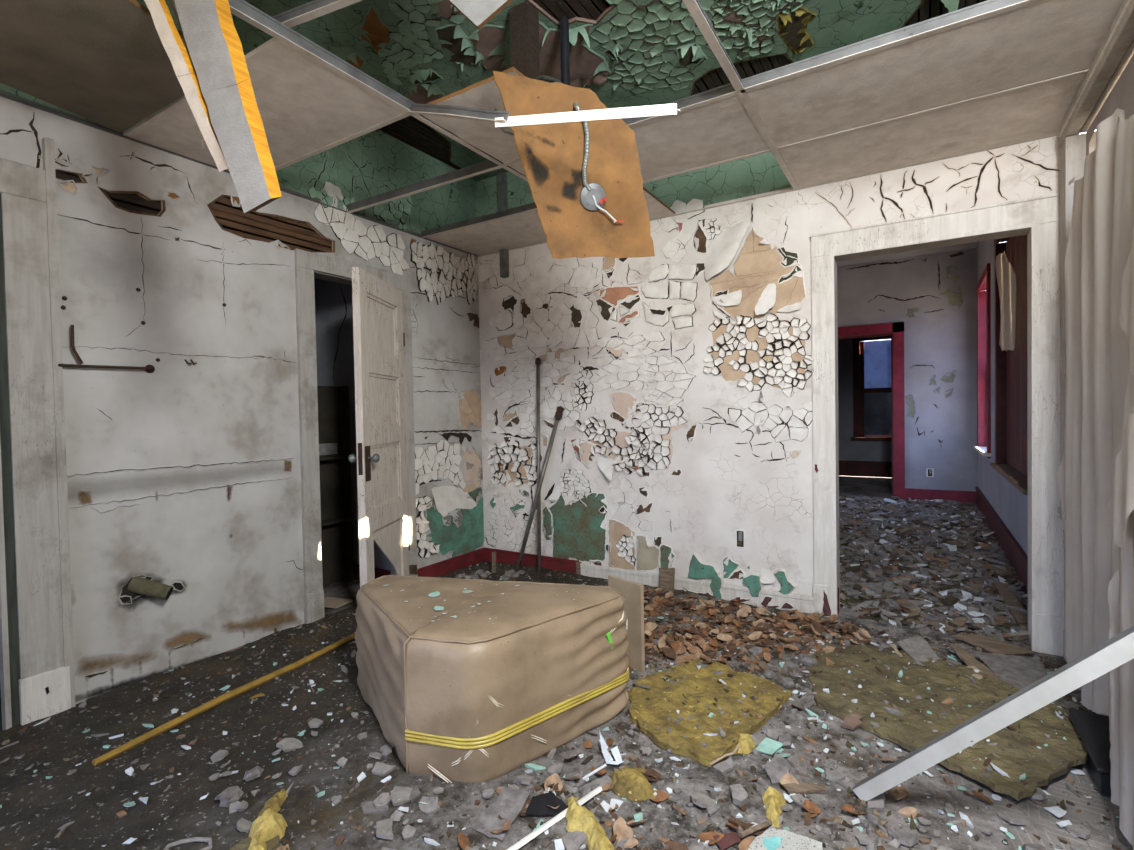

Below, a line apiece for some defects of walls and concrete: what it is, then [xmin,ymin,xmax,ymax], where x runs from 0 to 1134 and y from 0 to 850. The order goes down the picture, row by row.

peeling [343,0,509,170]
peeling [525,0,818,96]
crack [0,111,99,184]
crack [119,150,200,206]
crack [750,203,811,244]
crack [814,144,1060,228]
crack [57,213,296,364]
peeling [207,181,813,575]
peeling [686,552,796,609]